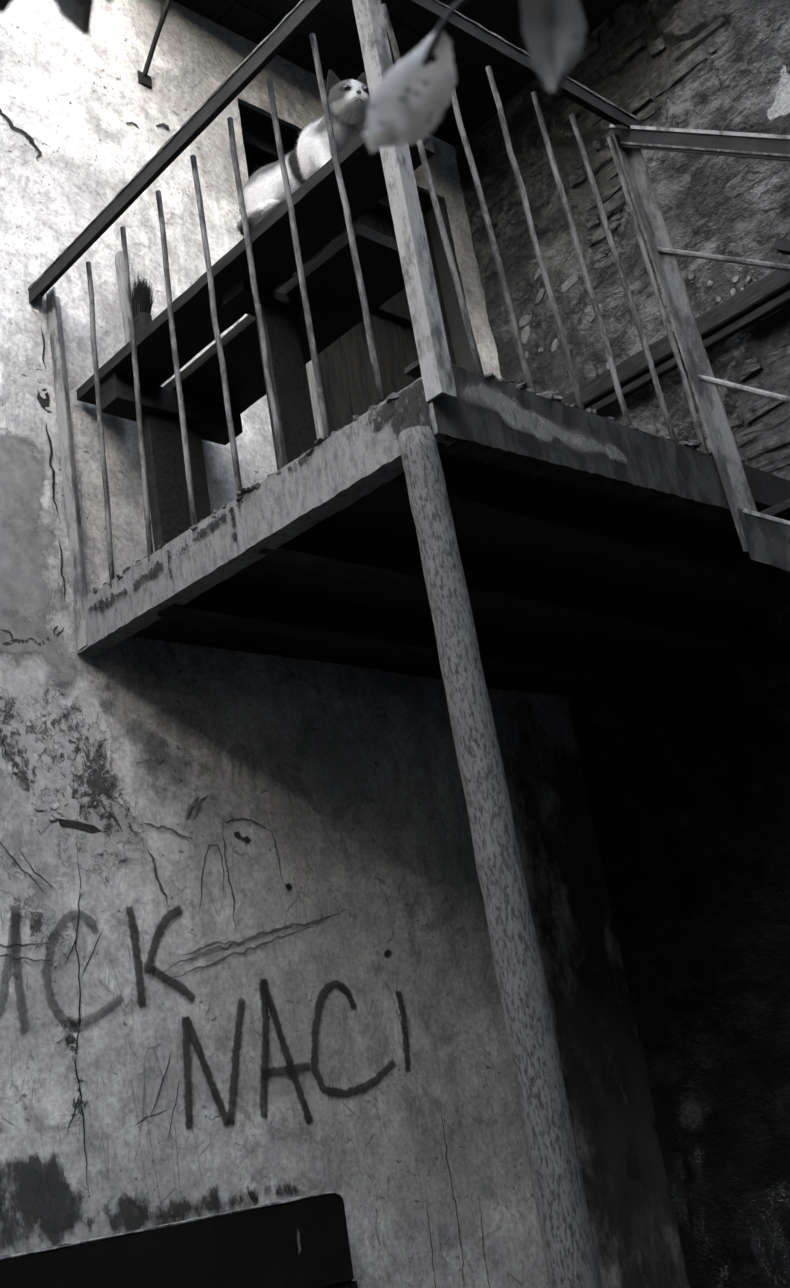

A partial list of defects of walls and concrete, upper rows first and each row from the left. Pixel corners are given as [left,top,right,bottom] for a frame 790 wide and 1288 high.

crack [0,108,42,161]
flaking render [766,65,790,121]
crack [39,328,47,370]
crack [0,423,66,646]
peeling [0,687,142,882]
crack [65,851,103,1203]
leakage [0,1154,298,1248]